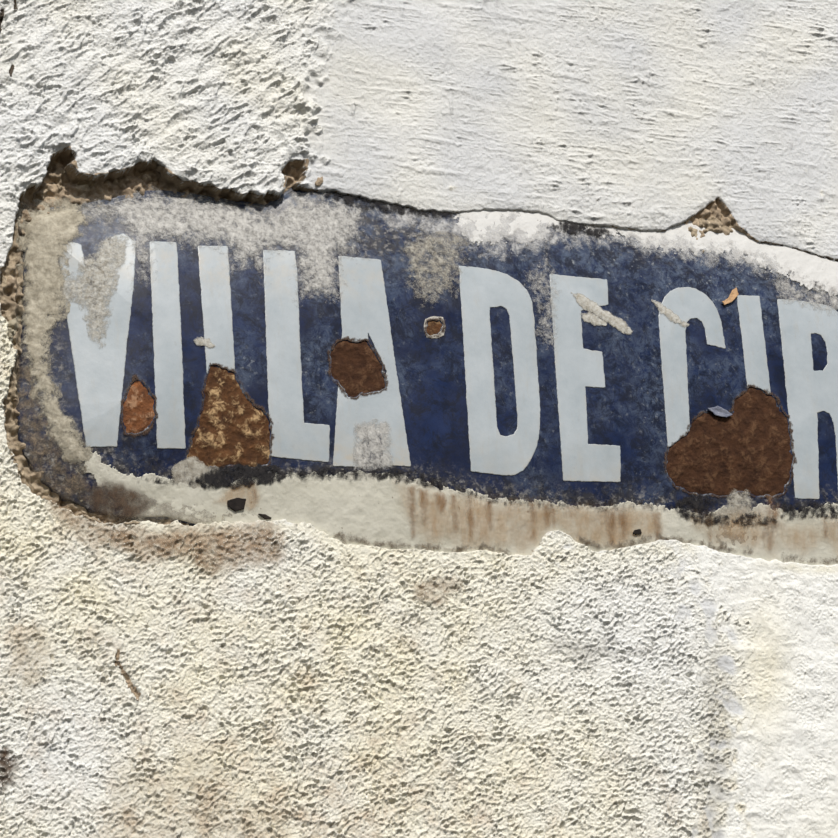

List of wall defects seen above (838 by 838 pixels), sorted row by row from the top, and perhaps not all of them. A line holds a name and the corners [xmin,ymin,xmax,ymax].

spalling [18,146,274,224]
spalling [283,159,309,190]
spalling [658,199,759,242]
peeling [722,288,738,305]
peeling [571,292,632,334]
peeling [651,300,689,327]
peeling [194,337,215,348]
spalling [0,243,140,525]
peeling [707,406,733,418]